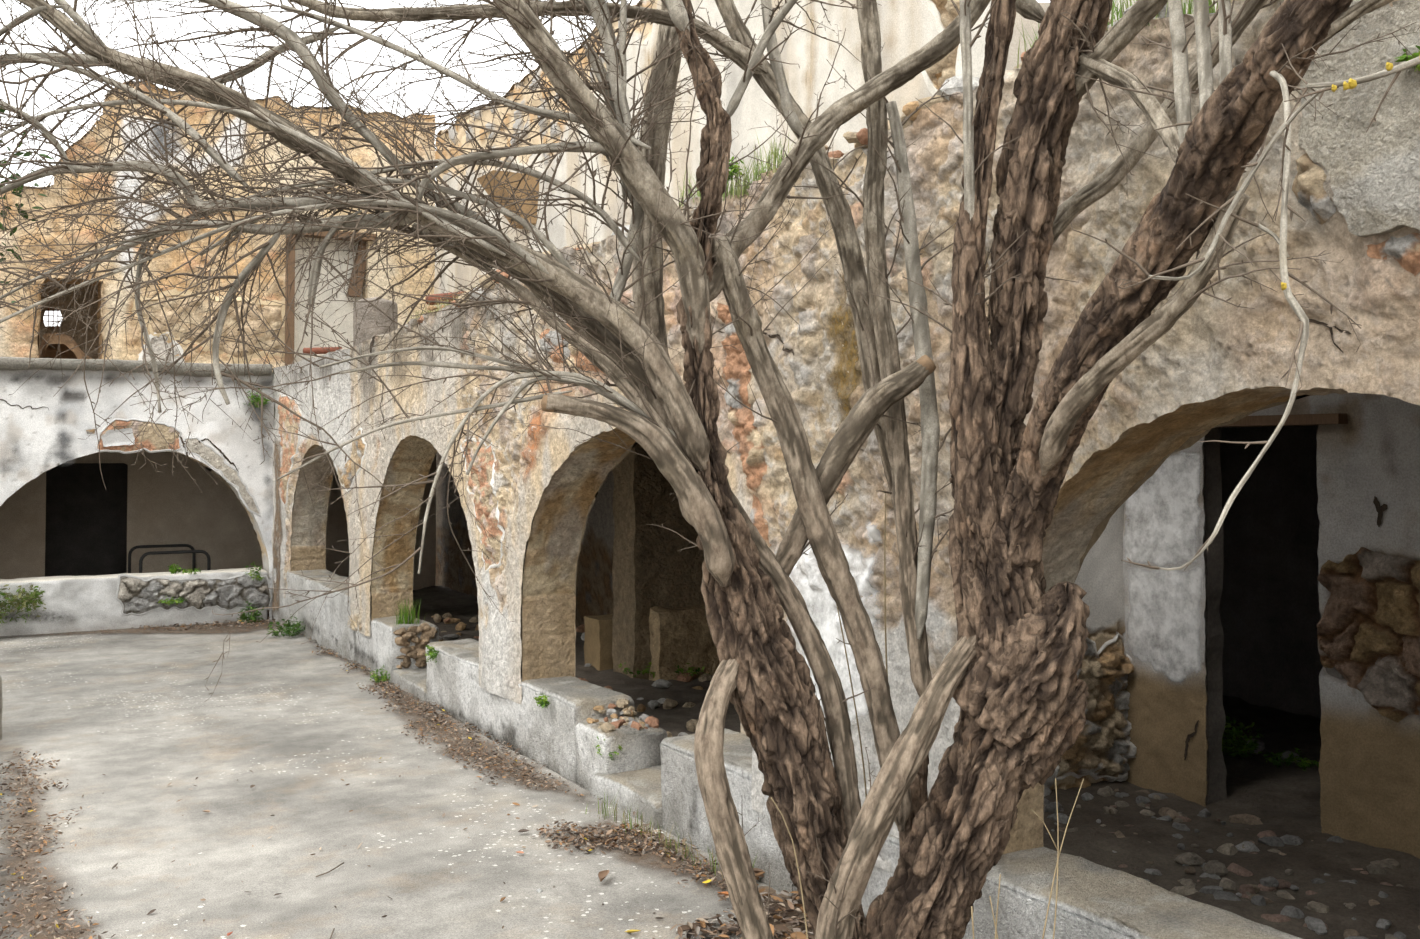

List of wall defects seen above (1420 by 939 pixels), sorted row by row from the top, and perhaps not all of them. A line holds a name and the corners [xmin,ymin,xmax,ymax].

flaking render [1364,233,1420,276]
crack [0,399,49,410]
flaking render [84,418,261,517]